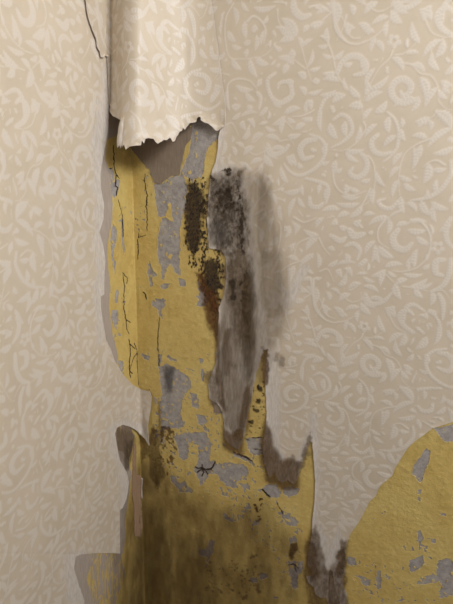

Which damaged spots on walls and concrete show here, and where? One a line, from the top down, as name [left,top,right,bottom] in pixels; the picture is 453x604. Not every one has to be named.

peeling [85,0,225,289]
crack [109,145,148,259]
crack [122,272,139,385]
water stain [183,168,311,490]
water stain [140,426,177,488]
crack [195,461,216,476]
peeling [157,354,262,493]
peeling [262,484,300,498]
peeling [412,448,431,502]
peeling [434,424,453,443]
water stain [305,532,347,604]
peeling [409,555,453,598]